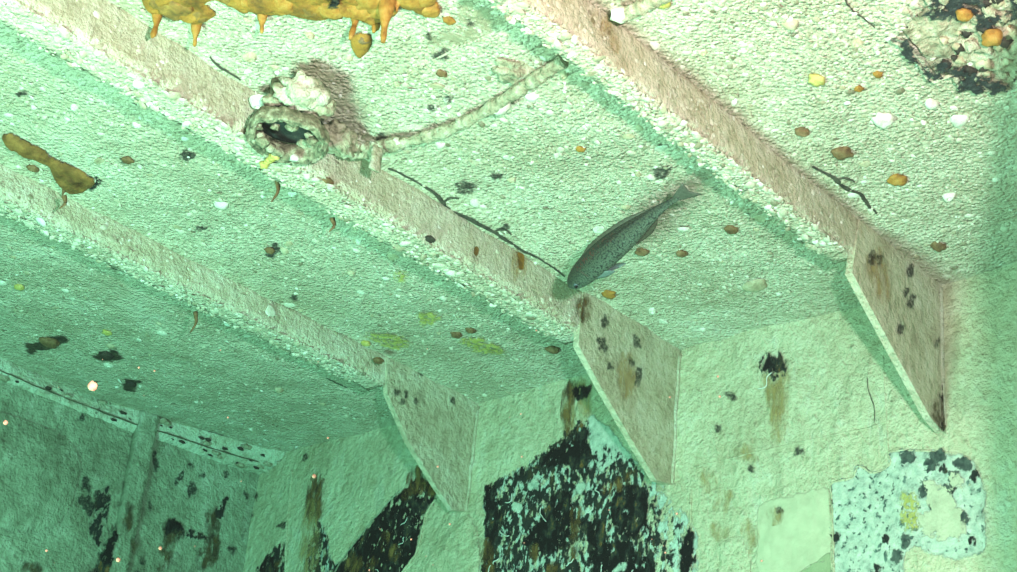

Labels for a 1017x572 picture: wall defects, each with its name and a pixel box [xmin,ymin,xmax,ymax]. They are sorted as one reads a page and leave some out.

rust [142,0,441,58]
rust [2,133,102,195]
crack [388,168,565,277]
crack [812,166,877,214]
rust [758,351,787,421]
peeling [801,448,987,572]